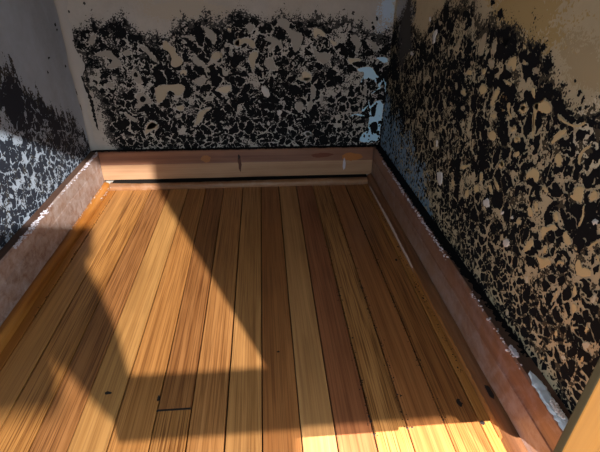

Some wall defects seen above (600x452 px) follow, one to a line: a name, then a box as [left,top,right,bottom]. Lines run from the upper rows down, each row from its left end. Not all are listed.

leakage [0,55,91,249]
peeling [348,34,386,143]